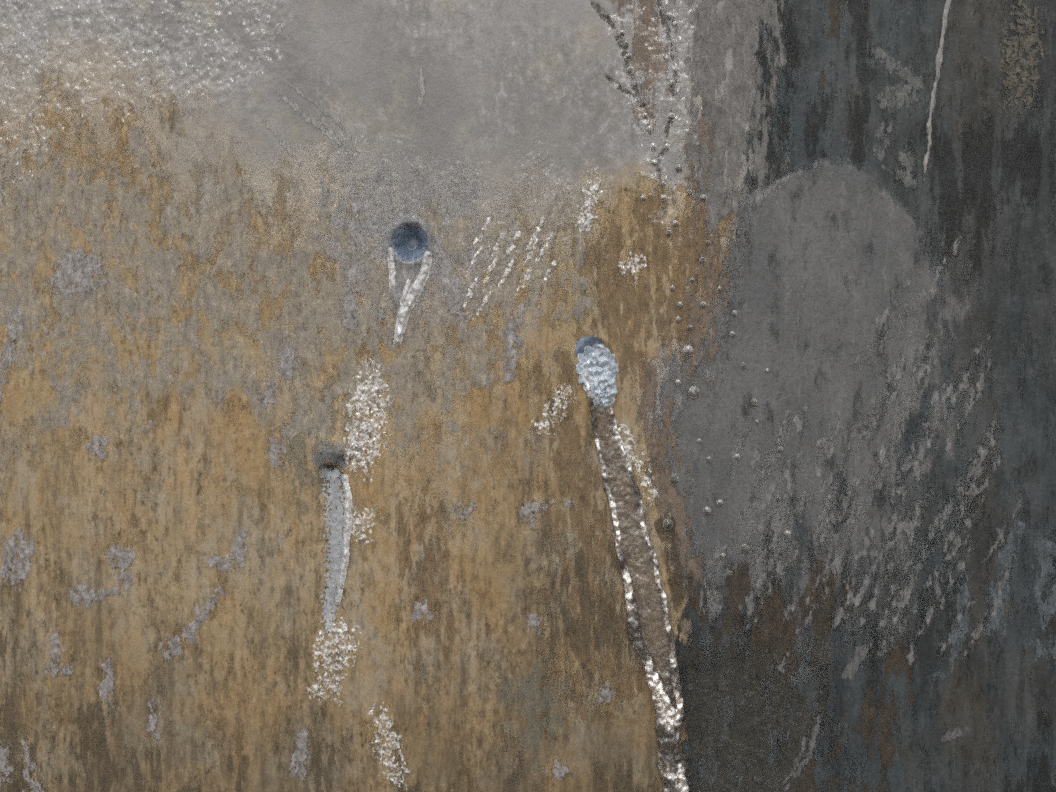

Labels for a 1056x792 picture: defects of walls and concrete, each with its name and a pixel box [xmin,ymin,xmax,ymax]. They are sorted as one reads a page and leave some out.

crack [591,0,677,213]
damp [0,83,607,481]
damp [342,504,374,543]
rust [0,76,733,792]
damp [395,481,459,674]
rust [718,561,851,673]
damp [368,702,419,792]